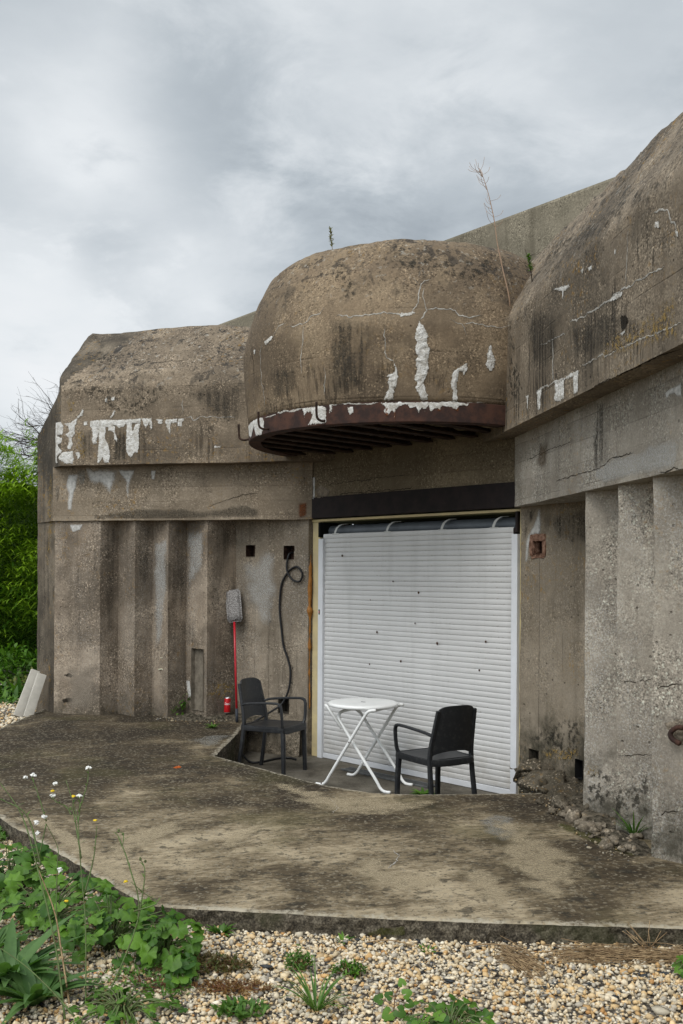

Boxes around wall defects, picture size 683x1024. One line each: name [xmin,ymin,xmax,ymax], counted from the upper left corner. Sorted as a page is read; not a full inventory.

leakage [248,321,482,437]
crack [252,279,509,403]
leakage [509,321,579,410]
crack [541,230,663,376]
crack [583,323,678,392]
crack [557,453,632,481]
leakage [99,506,257,539]
leakage [156,536,202,637]